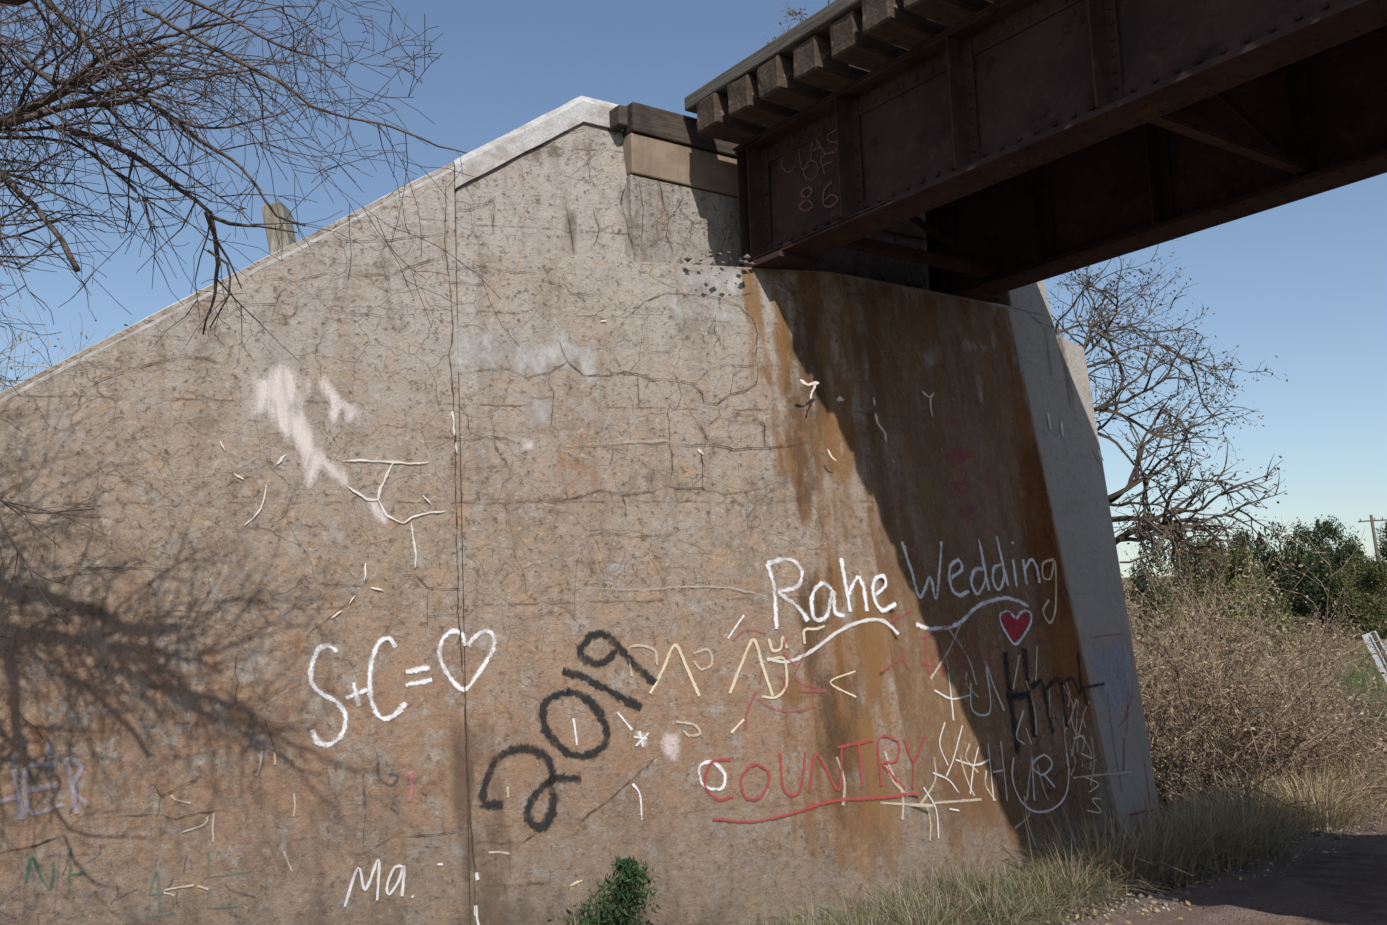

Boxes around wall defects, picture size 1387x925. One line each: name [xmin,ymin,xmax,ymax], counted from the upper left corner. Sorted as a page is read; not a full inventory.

crack [528,128,738,251]
crack [225,189,809,925]
rust [741,268,1094,875]